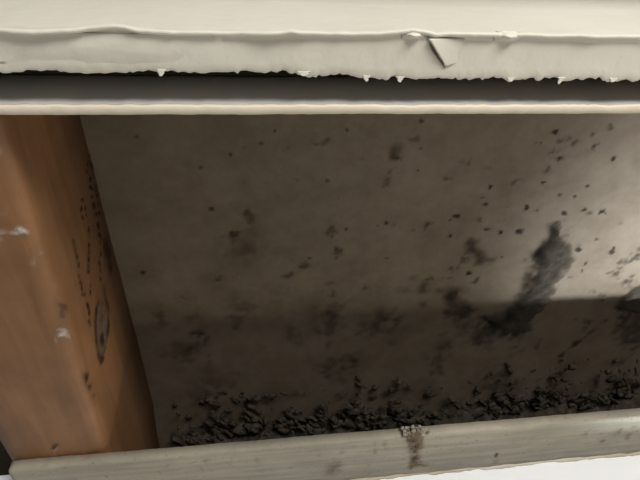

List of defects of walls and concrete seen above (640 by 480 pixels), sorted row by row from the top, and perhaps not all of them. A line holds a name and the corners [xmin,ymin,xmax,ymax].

peeling [427,36,465,68]
damp [490,224,573,336]